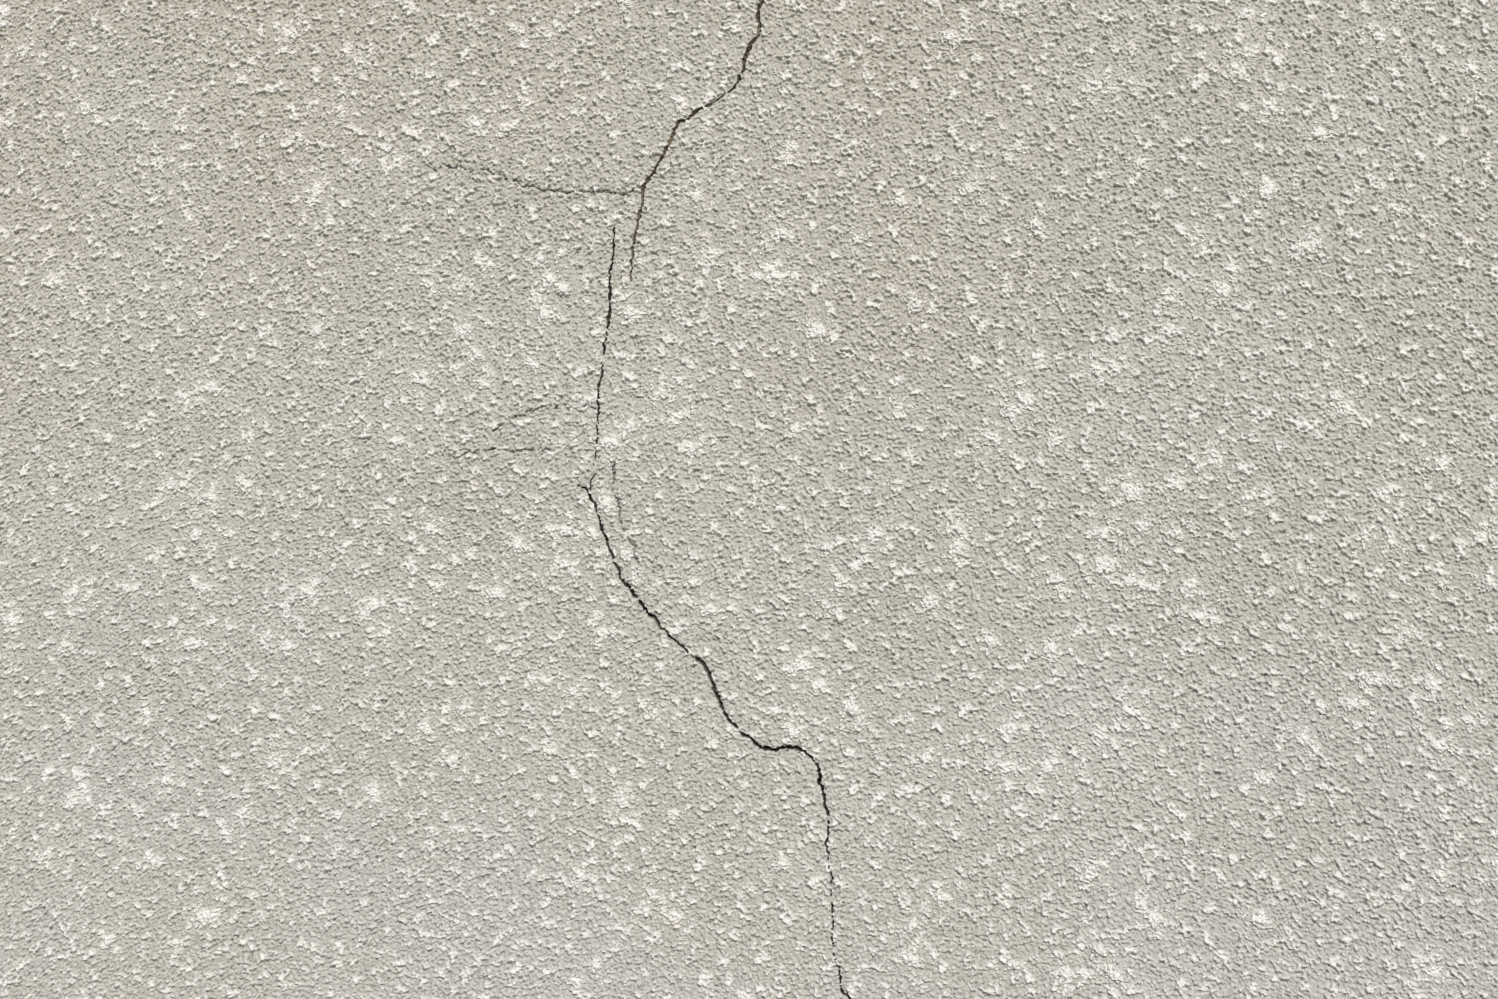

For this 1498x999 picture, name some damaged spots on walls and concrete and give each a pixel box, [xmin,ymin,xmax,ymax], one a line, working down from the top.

crack [427,0,851,999]